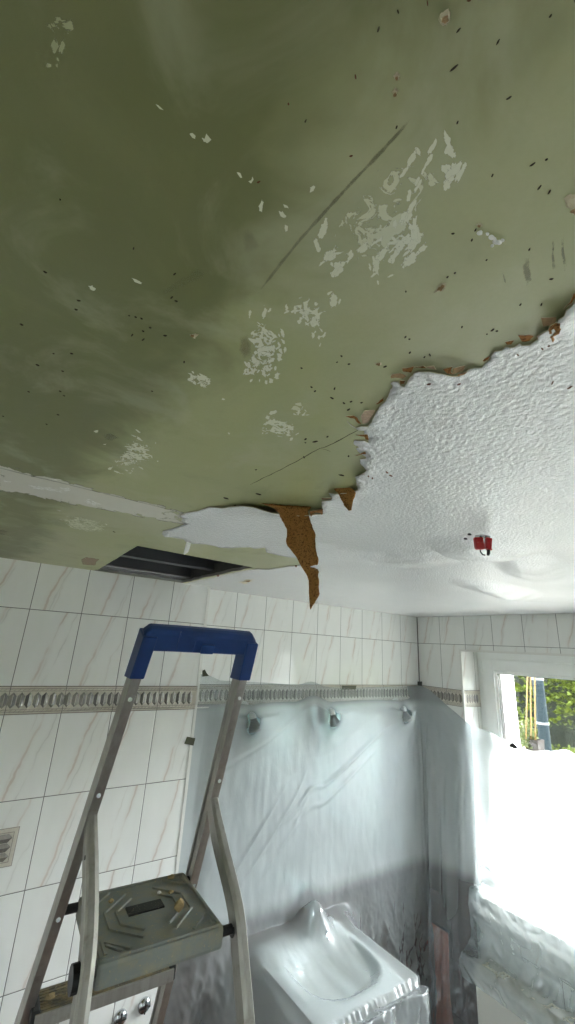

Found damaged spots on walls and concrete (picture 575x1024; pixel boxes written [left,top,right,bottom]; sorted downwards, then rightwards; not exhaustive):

peeling [314,130,467,285]
peeling [243,328,287,384]
peeling [284,304,326,347]
peeling [375,336,431,384]
peeling [443,365,467,385]
peeling [486,329,534,356]
peeling [540,293,575,350]
peeling [330,387,369,457]